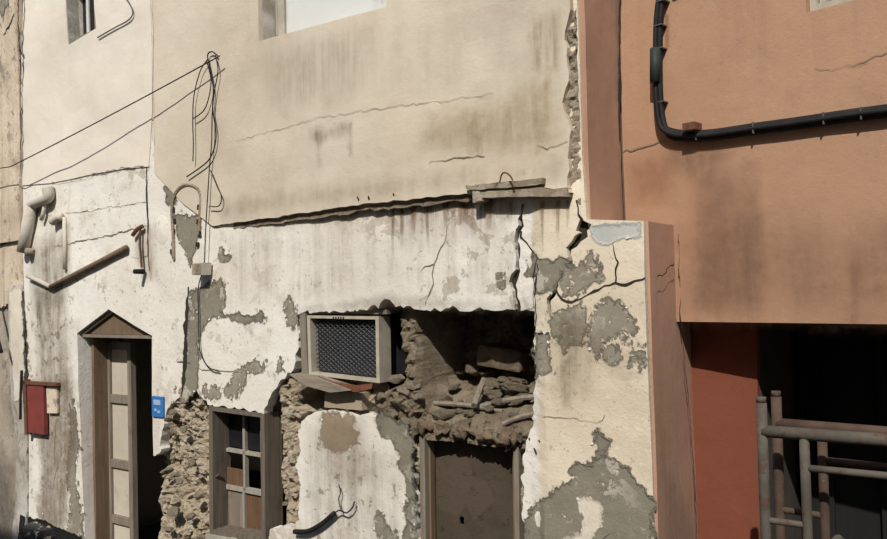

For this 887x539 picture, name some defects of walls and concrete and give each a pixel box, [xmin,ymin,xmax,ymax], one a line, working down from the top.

peeling [163,183,202,268]
peeling [217,246,232,263]
crack [420,205,450,303]
peeling [178,277,285,404]
peeling [282,295,299,330]
spalling [309,221,658,539]
crack [512,200,697,532]